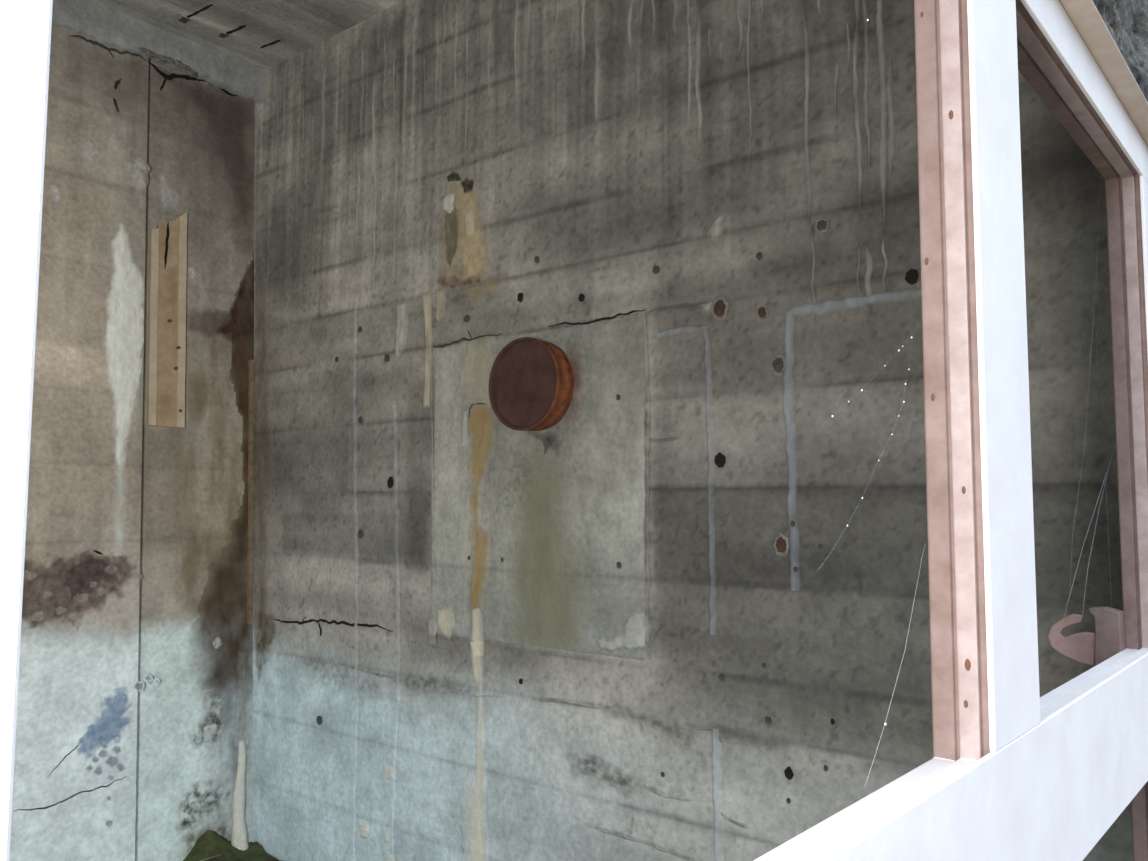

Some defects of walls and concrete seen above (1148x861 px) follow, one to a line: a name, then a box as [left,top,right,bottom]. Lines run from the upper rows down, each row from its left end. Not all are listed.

crack [69,35,253,101]
spalling [435,169,506,309]
crack [431,331,502,348]
leakage [21,216,145,634]
rust [427,332,498,861]
crack [274,617,500,712]
crack [14,738,125,811]